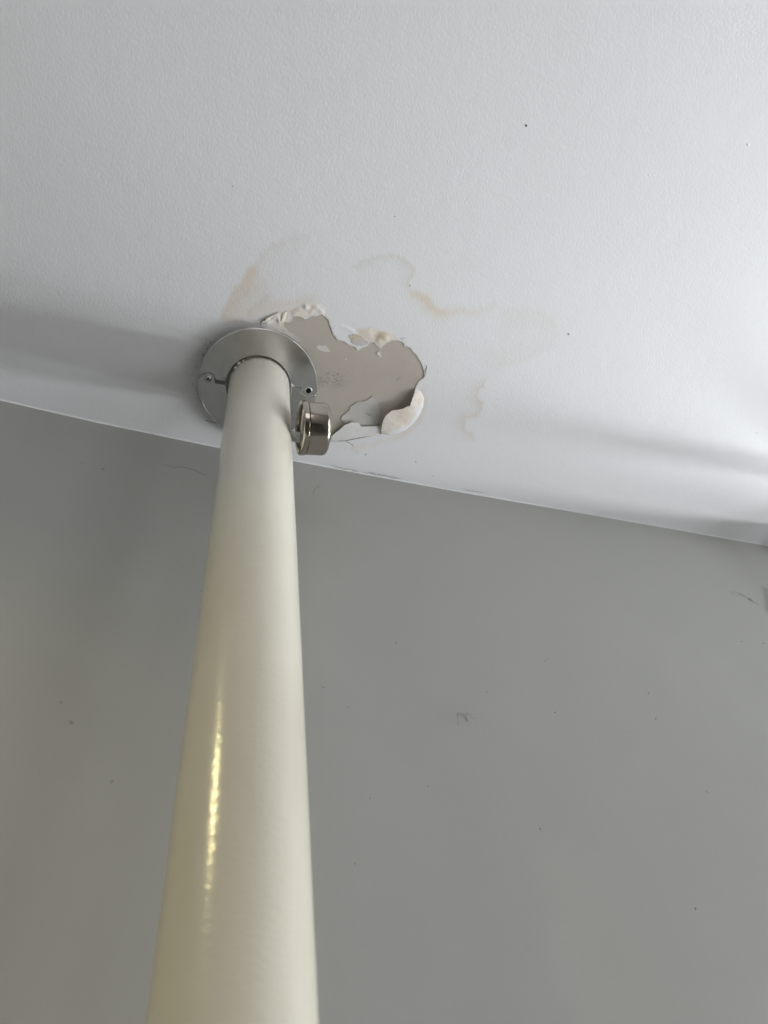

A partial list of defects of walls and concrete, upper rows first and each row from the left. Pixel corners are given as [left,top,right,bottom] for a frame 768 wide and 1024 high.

damp [218,228,319,332]
peeling [283,314,427,446]
damp [389,372,489,450]